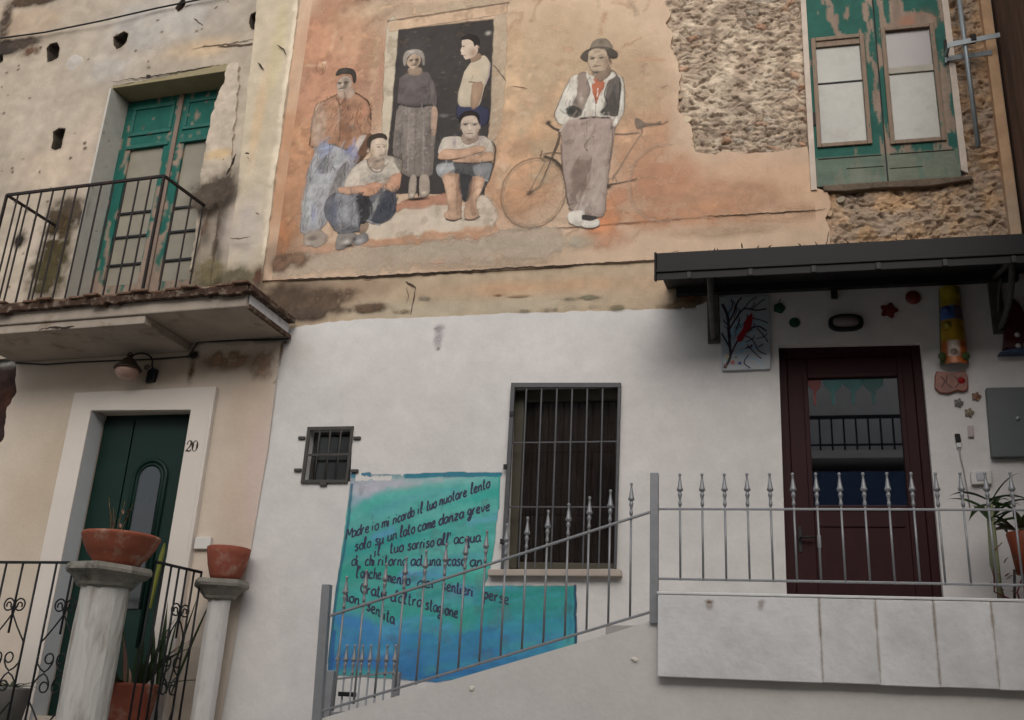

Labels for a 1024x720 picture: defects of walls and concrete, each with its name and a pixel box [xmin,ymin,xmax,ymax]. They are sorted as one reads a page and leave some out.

flaking render [664,0,809,155]
flaking render [826,0,1008,244]
water stain [29,198,83,294]
water stain [191,170,385,320]
water stain [189,351,272,377]